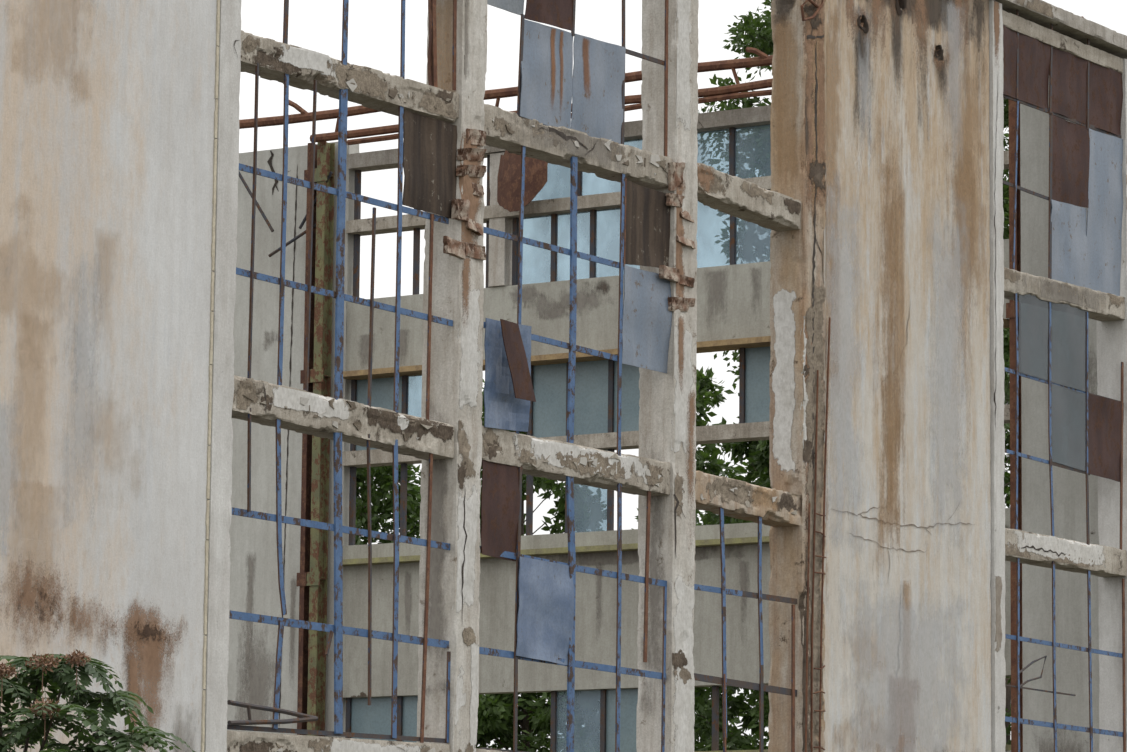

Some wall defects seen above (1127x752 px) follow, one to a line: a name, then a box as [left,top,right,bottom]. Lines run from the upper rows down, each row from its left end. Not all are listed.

spalling [241,35,459,119]
corrosion [462,258,471,323]
corrosion [676,165,715,298]
spalling [740,181,801,215]
corrosion [773,0,841,377]
corrosion [884,172,904,521]
corrosion [7,562,183,752]
peeling [227,739,442,752]
peeling [233,289,685,613]
peeling [454,627,479,752]
spalling [700,274,831,752]
crack [833,503,972,672]